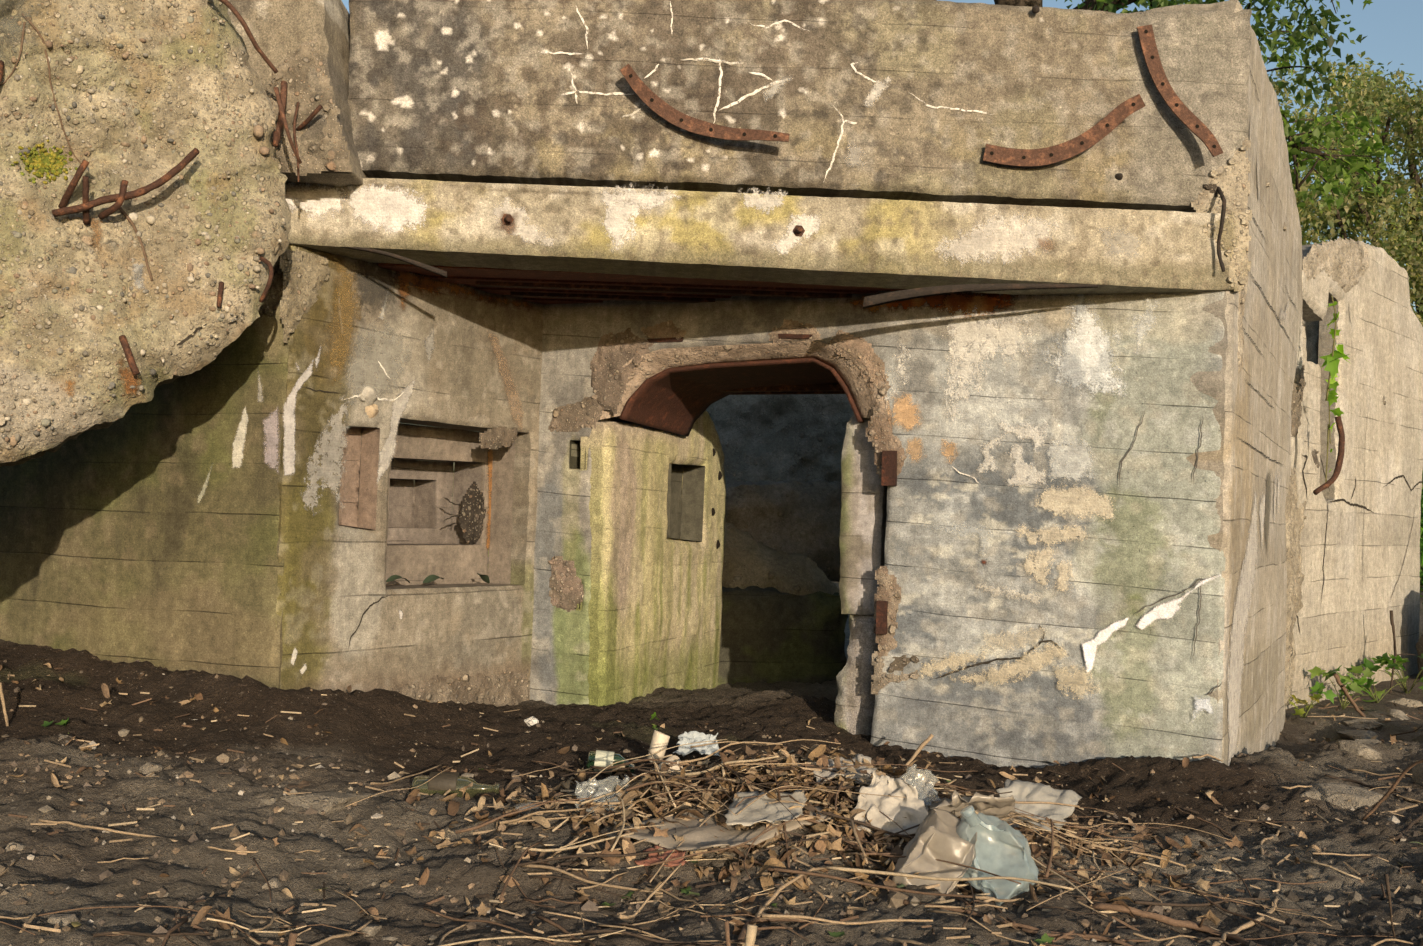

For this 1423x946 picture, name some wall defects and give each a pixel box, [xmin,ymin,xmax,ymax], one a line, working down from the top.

crack [750,19,809,31]
crack [538,3,785,124]
crack [851,61,877,82]
crack [910,93,992,115]
crack [825,105,856,178]
spalling [1191,137,1252,292]
corrosion [846,292,1032,319]
spalling [1291,365,1306,437]
spalling [1284,416,1345,707]
crack [928,625,1070,681]